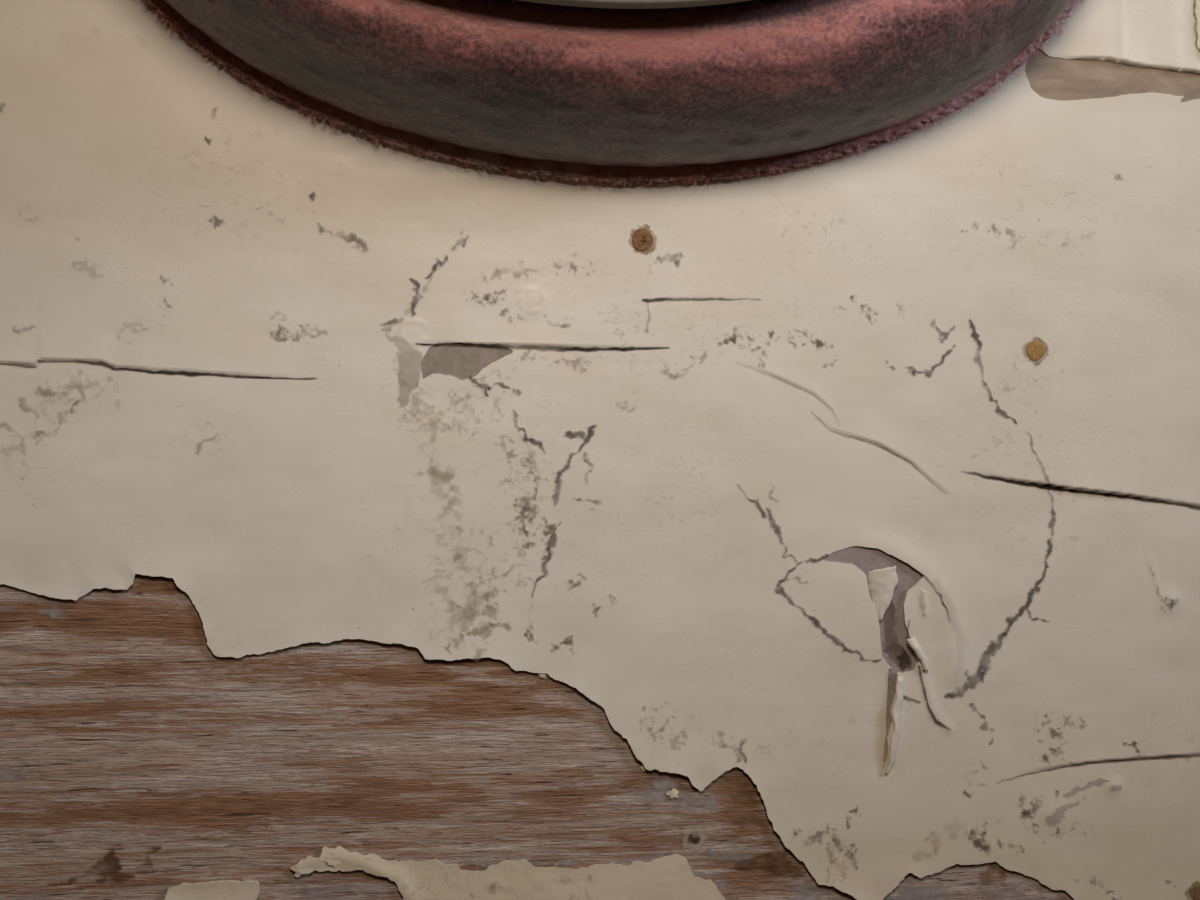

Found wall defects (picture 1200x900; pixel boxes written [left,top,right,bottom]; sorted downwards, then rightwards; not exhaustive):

peeling [1025,48,1200,102]
crack [388,261,509,348]
crack [77,361,314,379]
peeling [399,342,513,406]
crack [557,345,669,353]
crack [909,320,1032,446]
crack [469,376,596,495]
crack [749,499,880,662]
crack [903,472,1200,729]
peeling [0,574,856,900]
peeling [1047,779,1121,824]
peeling [883,862,1073,900]